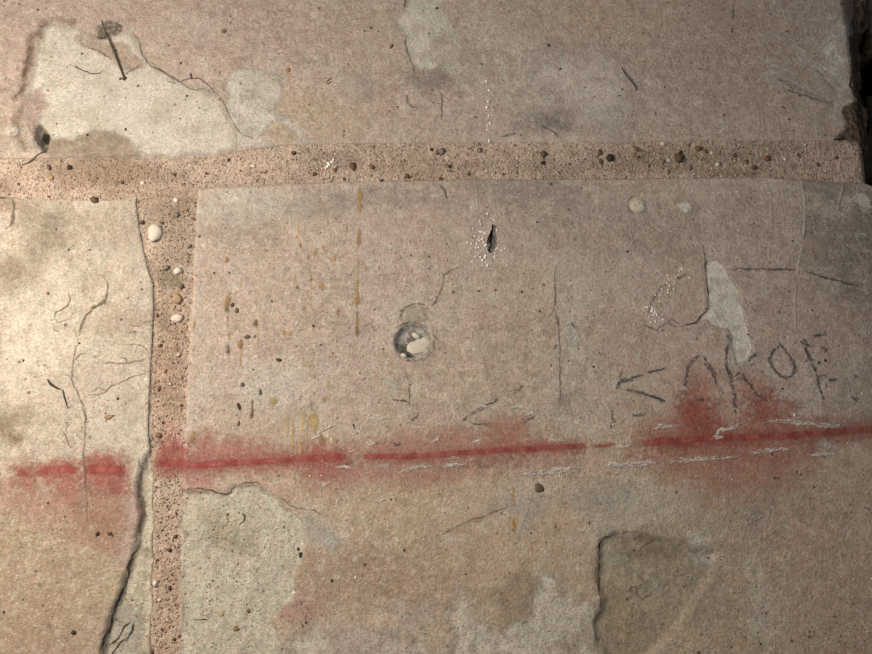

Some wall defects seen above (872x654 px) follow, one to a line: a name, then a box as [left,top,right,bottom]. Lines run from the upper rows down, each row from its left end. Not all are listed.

flaking render [21,25,309,166]
flaking render [395,0,486,82]
flaking render [684,247,754,372]
crack [54,277,150,510]
crack [99,460,146,654]
spalling [179,481,433,654]
spalling [442,531,709,654]